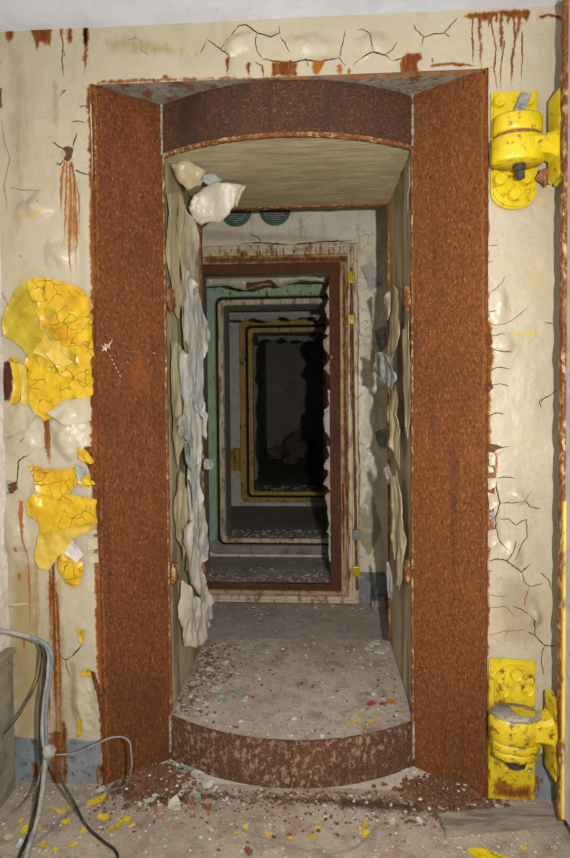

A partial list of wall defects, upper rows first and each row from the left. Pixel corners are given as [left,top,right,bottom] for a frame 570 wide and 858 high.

corrosion [31,28,89,66]
crack [200,24,402,69]
crack [414,17,458,46]
corrosion [337,9,562,443]
peeling [1,278,94,439]
peeling [5,443,100,588]
corrosion [60,75,197,785]
peeling [166,161,332,648]
peeling [360,261,411,602]
crack [487,476,557,674]